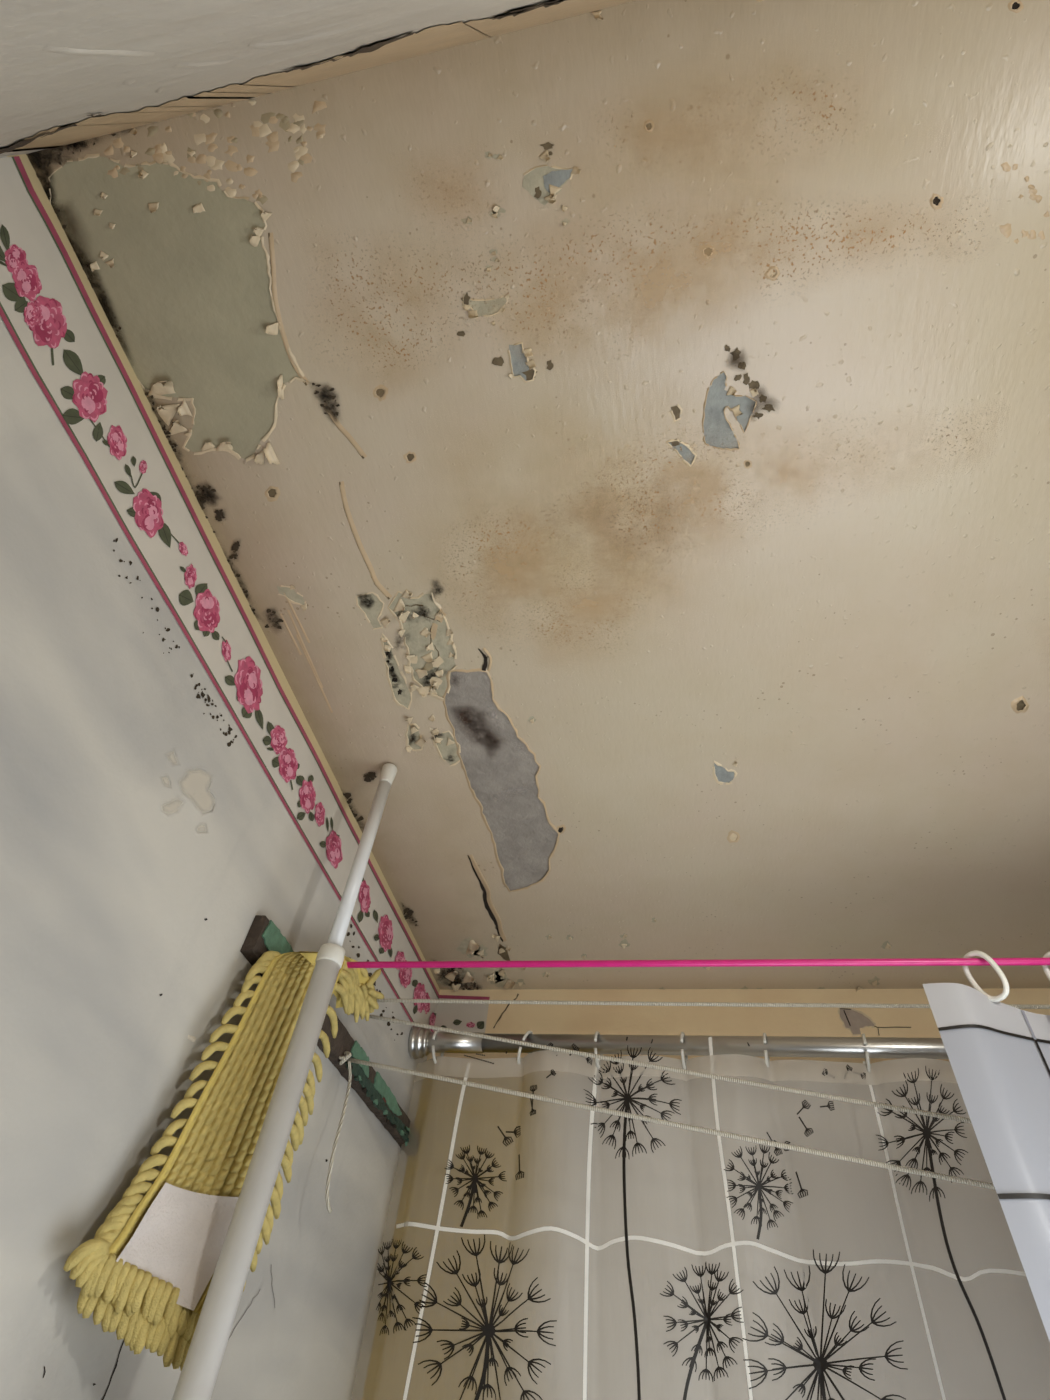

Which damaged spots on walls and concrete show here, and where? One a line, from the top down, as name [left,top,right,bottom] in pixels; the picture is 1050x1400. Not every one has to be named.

peeling [0,0,637,465]
peeling [930,193,944,210]
peeling [665,345,775,469]
peeling [265,486,281,502]
leakage [113,538,180,654]
leakage [190,673,237,747]
spalling [356,585,566,892]
crack [467,854,511,961]